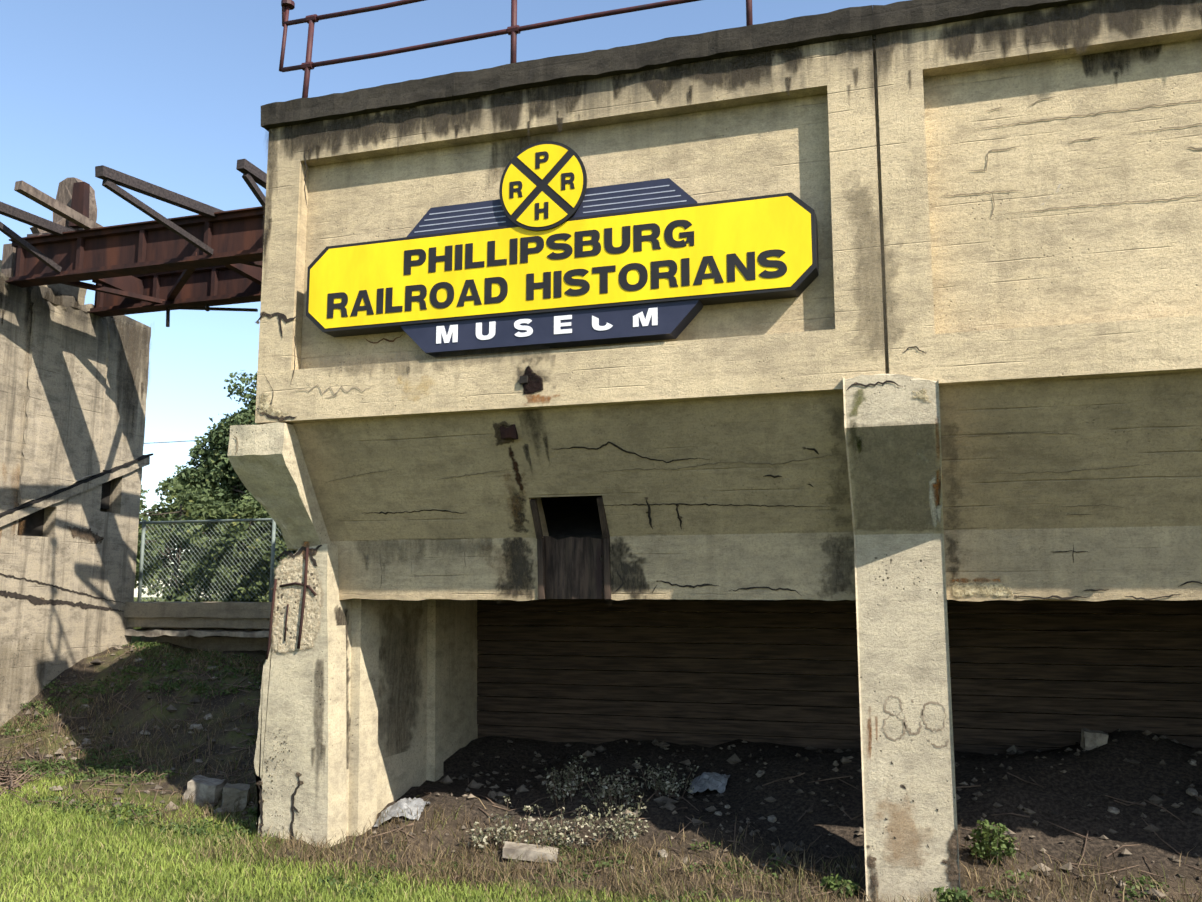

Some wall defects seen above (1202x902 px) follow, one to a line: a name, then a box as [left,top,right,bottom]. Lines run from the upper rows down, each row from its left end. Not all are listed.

leakage [944,0,1202,77]
crack [255,312,374,421]
crack [846,380,900,391]
corrosion [509,447,524,492]
crack [557,441,836,529]
crack [362,508,462,516]
spalling [67,526,104,544]
crack [0,573,125,612]
spalling [265,548,323,660]
crack [652,581,802,596]
crack [256,772,304,840]